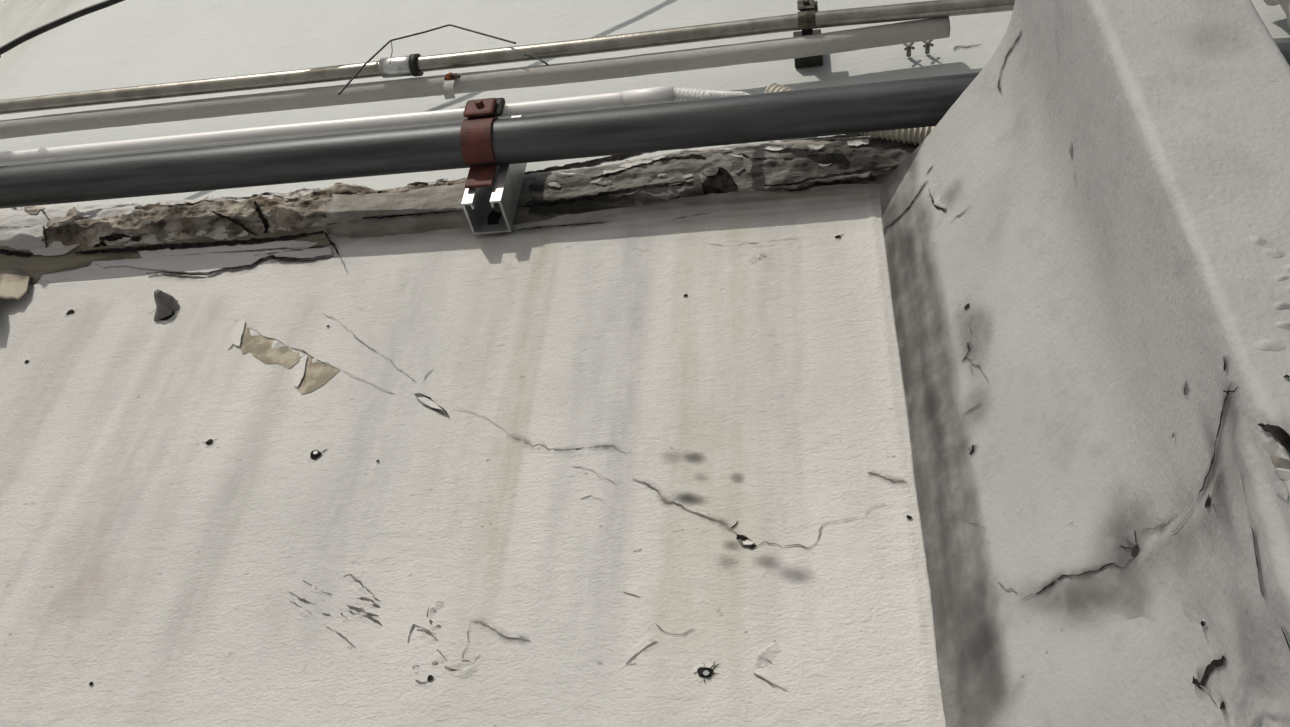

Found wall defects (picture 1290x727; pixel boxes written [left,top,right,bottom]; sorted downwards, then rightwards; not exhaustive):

spalling [517,133,918,220]
peeling [0,178,467,300]
crack [146,210,464,275]
crack [512,221,611,231]
peeling [229,317,340,394]
crack [322,313,433,395]
crack [454,408,907,548]
crack [998,359,1266,600]
crack [1258,423,1290,451]
crack [1182,655,1226,709]